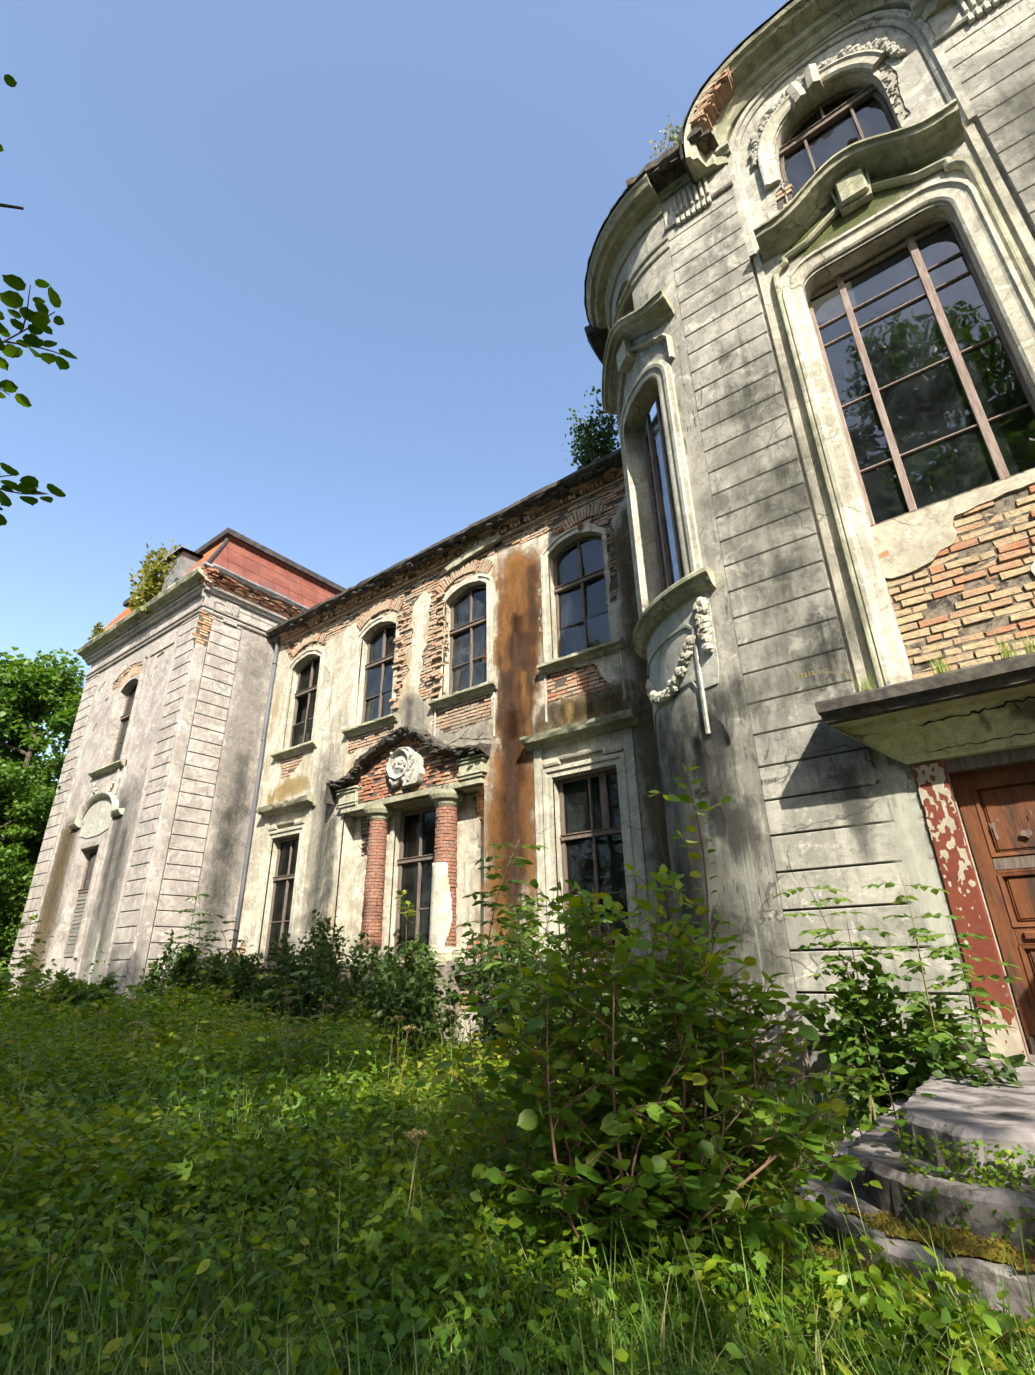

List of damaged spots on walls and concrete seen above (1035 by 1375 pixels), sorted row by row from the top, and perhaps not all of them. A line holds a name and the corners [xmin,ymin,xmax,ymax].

flaking render [280,476,626,857]
corrosion [481,549,543,960]
peeling [913,763,981,957]
flaking render [870,467,1035,680]
peeling [977,985,1035,1062]